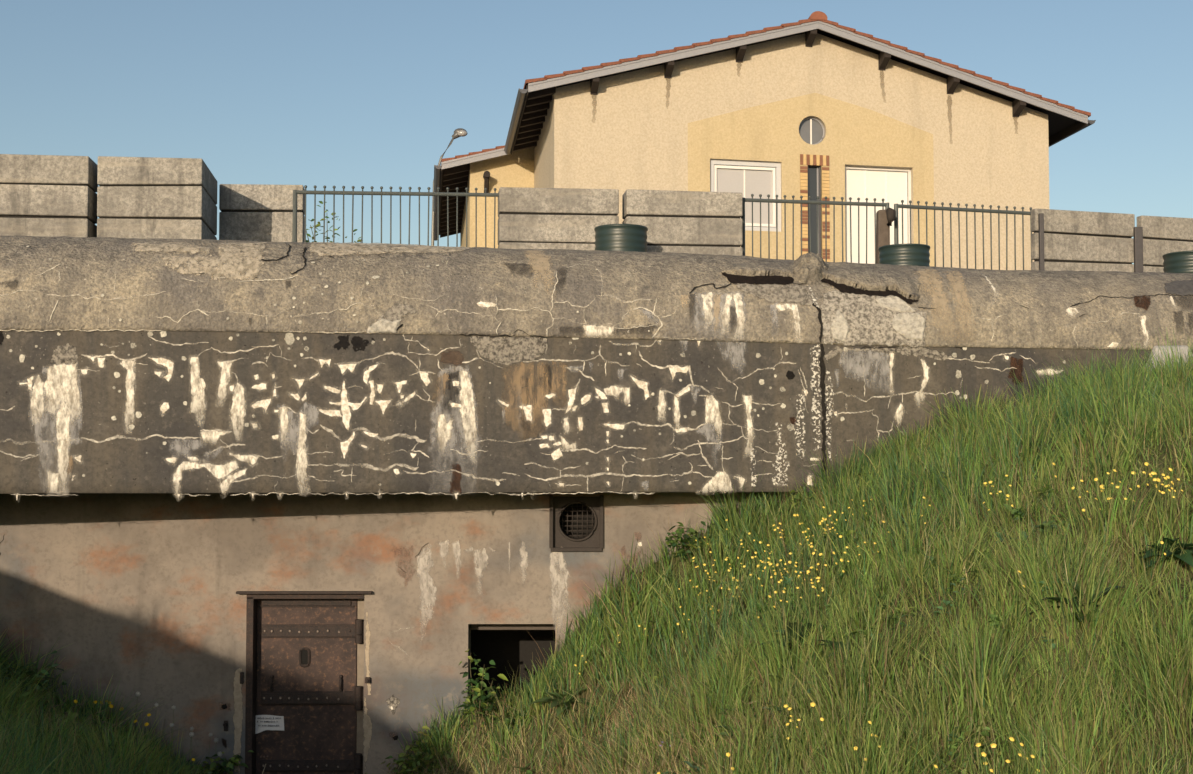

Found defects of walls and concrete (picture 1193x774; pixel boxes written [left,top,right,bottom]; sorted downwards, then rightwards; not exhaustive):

crack [1,241,689,379]
spalling [689,261,952,362]
crack [948,276,1193,372]
water stain [19,353,147,490]
crack [84,434,200,443]
water stain [190,357,246,431]
water stain [272,403,319,479]
water stain [430,365,478,447]
corrosion [450,464,462,498]
corrosion [499,361,583,427]
crack [253,286,957,491]
water stain [658,366,722,450]